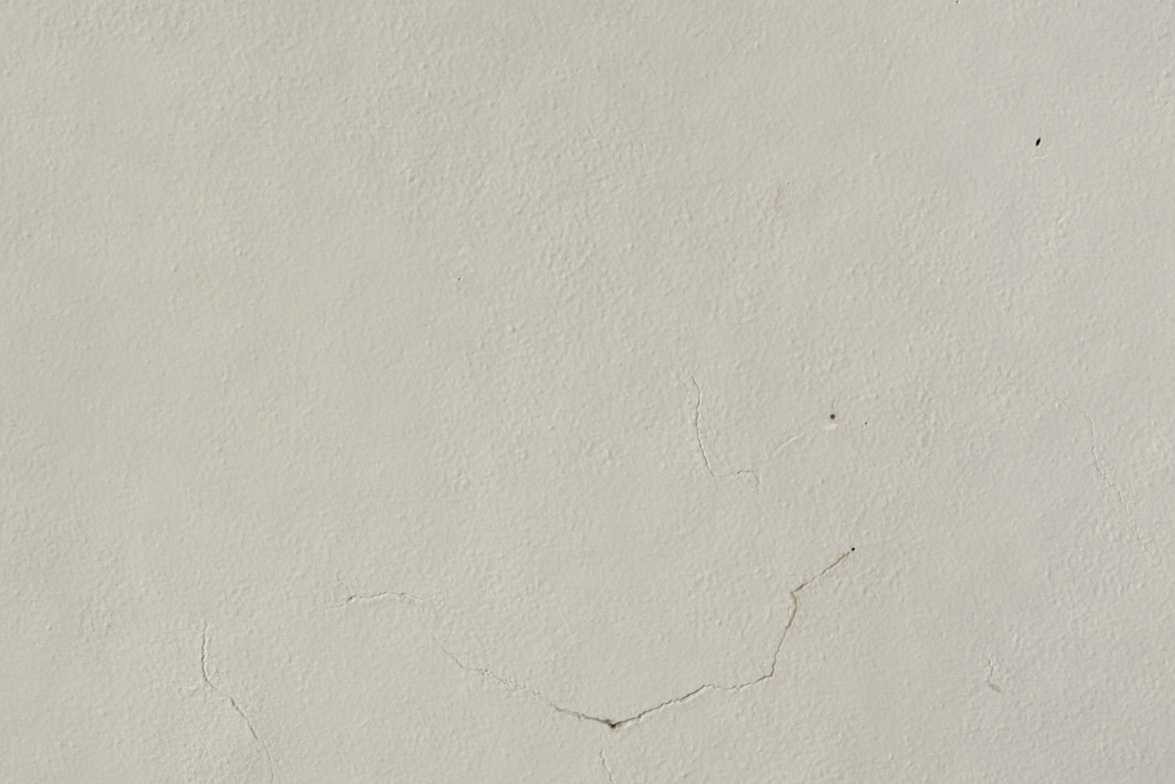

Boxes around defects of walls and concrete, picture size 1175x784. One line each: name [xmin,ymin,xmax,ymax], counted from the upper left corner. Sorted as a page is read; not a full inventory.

crack [430,540,864,784]